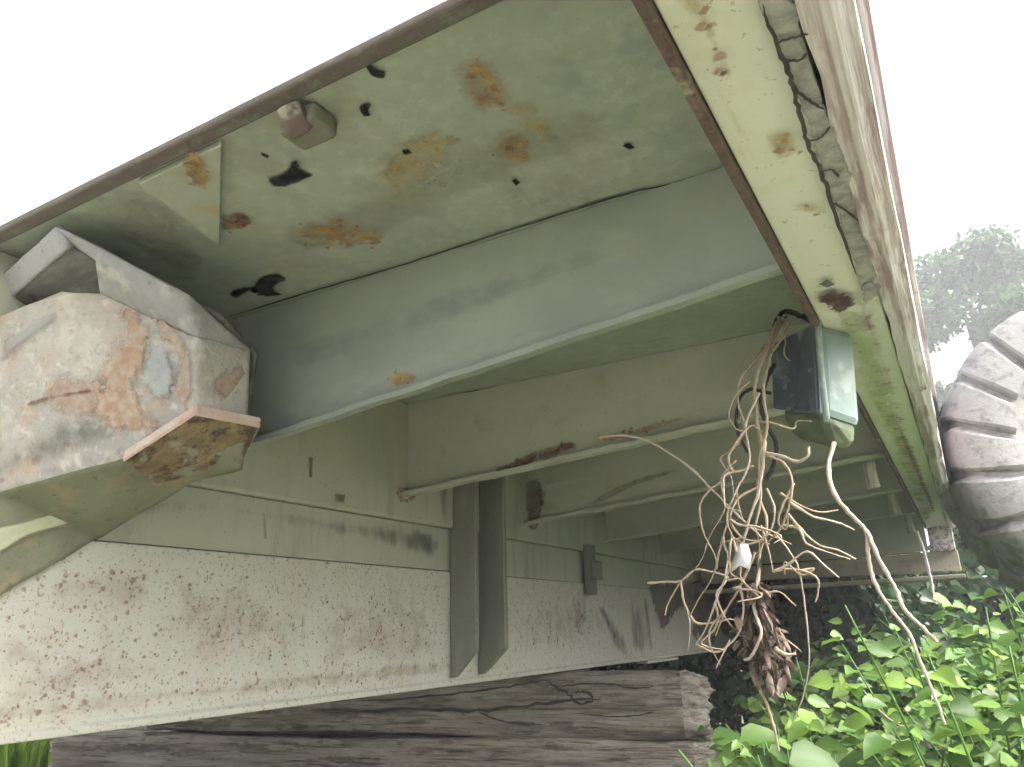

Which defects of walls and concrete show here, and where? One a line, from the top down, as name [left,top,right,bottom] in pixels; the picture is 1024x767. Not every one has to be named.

crack [762,4,859,275]
peeling [269,161,312,187]
peeling [230,275,285,298]
corrosion [818,292,880,351]
peeling [44,309,190,436]
corrosion [496,442,574,471]
crack [211,679,653,734]